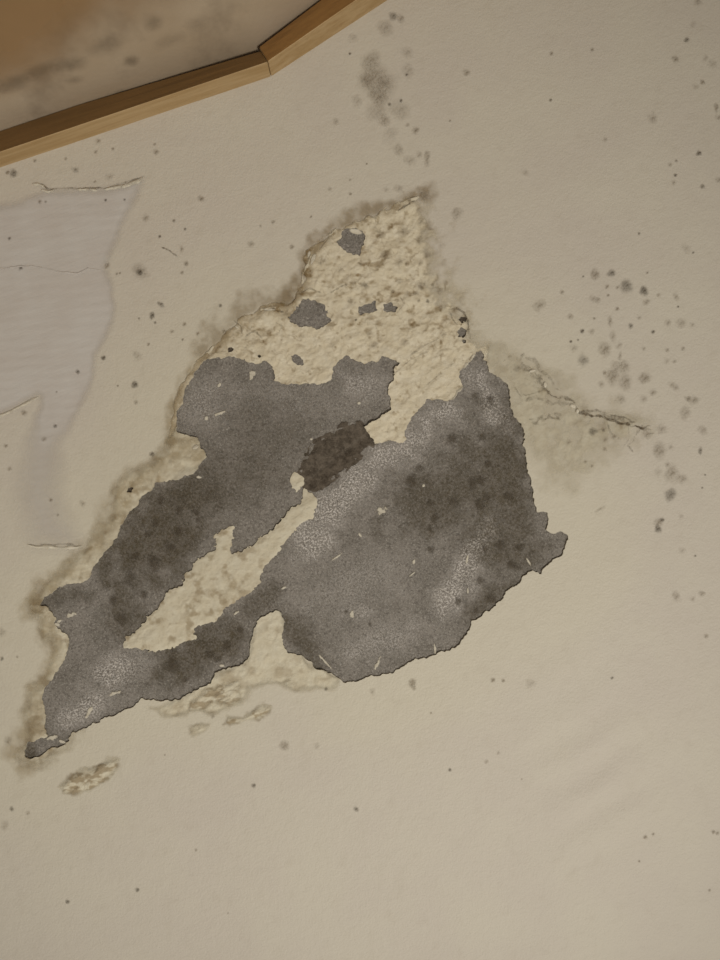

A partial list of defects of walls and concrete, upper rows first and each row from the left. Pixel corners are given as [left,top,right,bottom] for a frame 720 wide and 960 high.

flaking render [18,196,637,764]
crack [529,369,643,430]